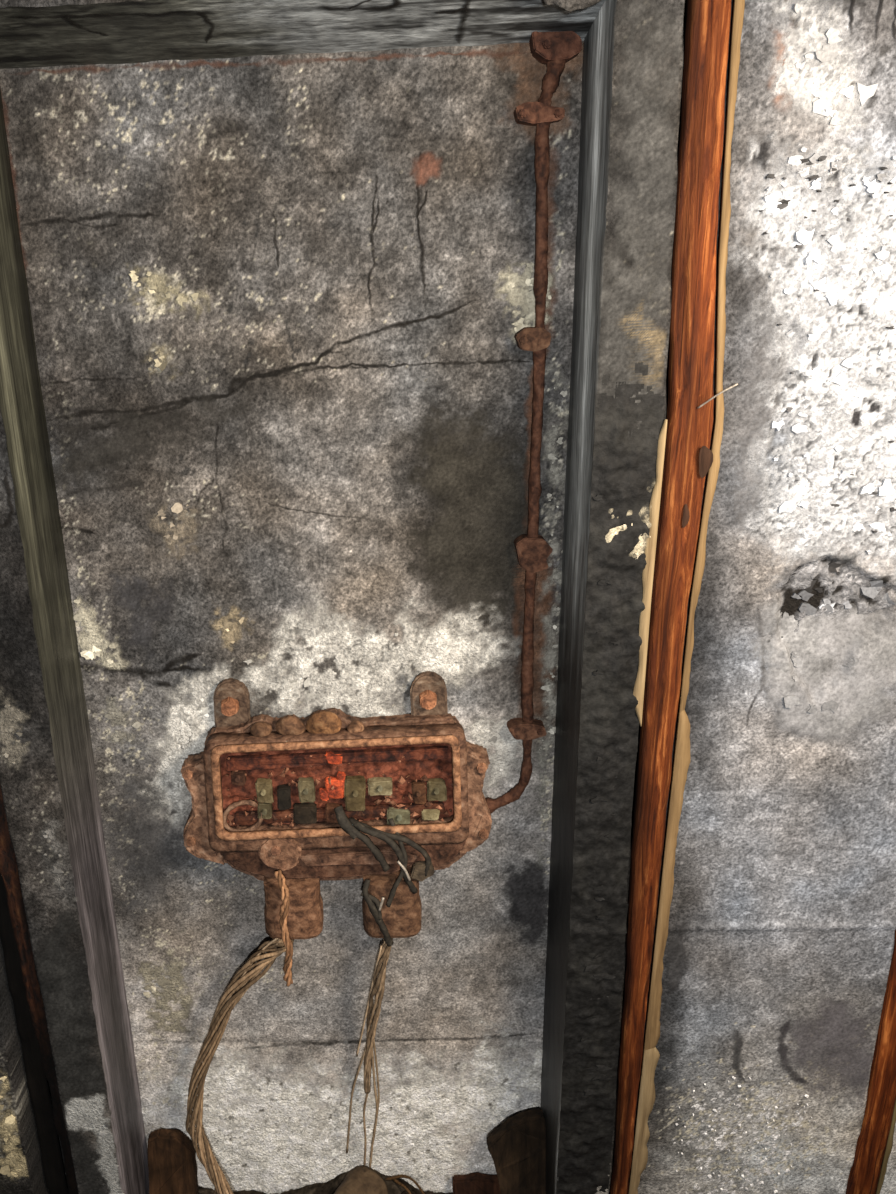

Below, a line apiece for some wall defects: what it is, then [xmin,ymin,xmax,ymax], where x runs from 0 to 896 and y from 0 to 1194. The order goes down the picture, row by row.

crack [29,213,153,226]
crack [58,156,529,429]
rust [414,153,440,184]
spalling [749,0,896,638]
damp [112,413,528,874]